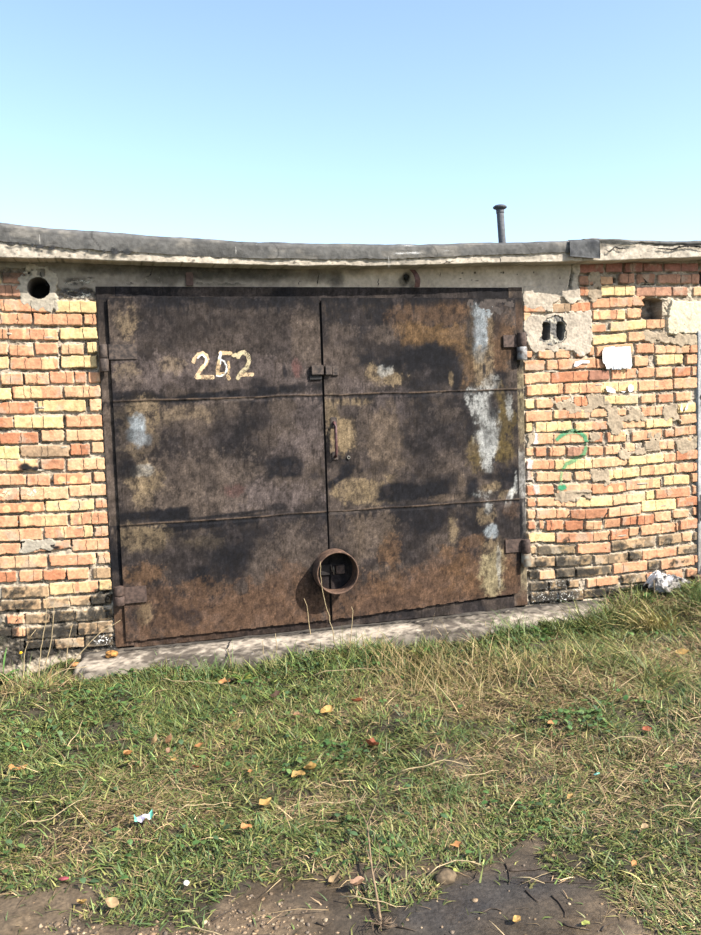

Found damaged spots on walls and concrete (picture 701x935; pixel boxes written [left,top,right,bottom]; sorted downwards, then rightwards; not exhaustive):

damp [529,557,648,605]
damp [0,587,115,666]